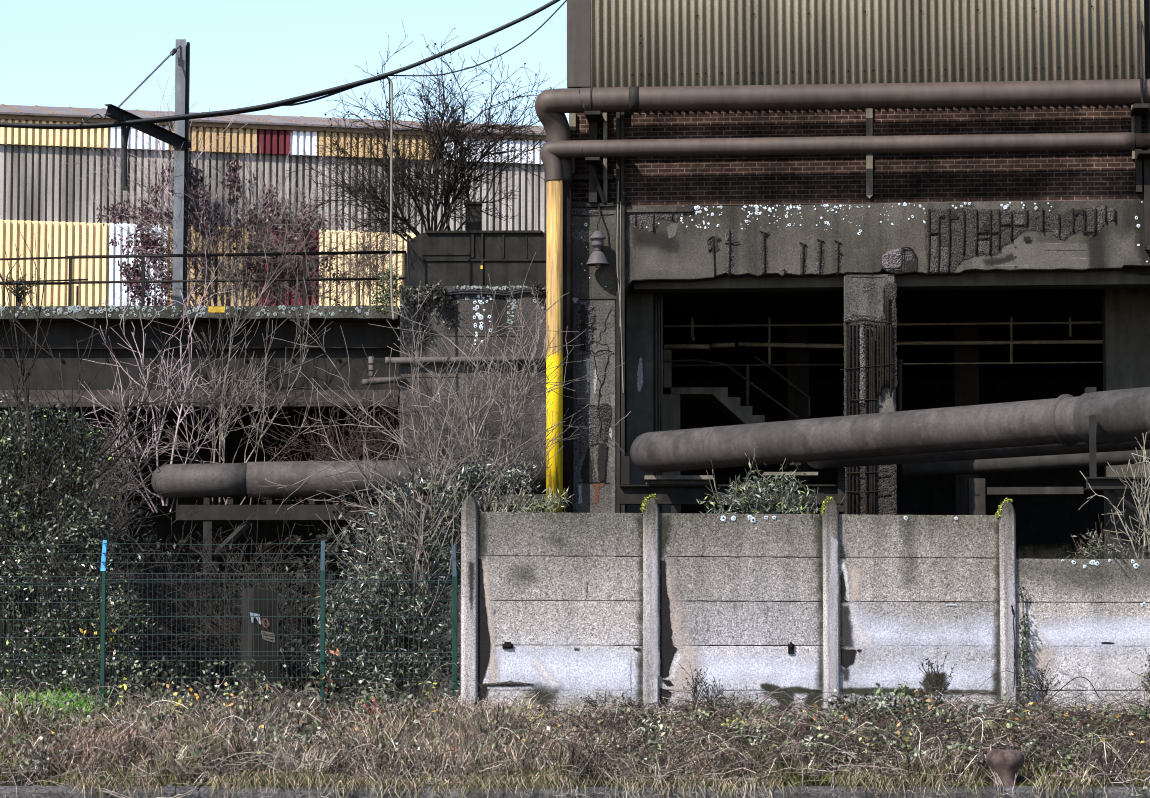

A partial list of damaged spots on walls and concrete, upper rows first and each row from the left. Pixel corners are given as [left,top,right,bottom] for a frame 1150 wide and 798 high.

spalling [840,205,1115,416]
spalling [844,464,897,515]
water stain [469,515,1150,713]